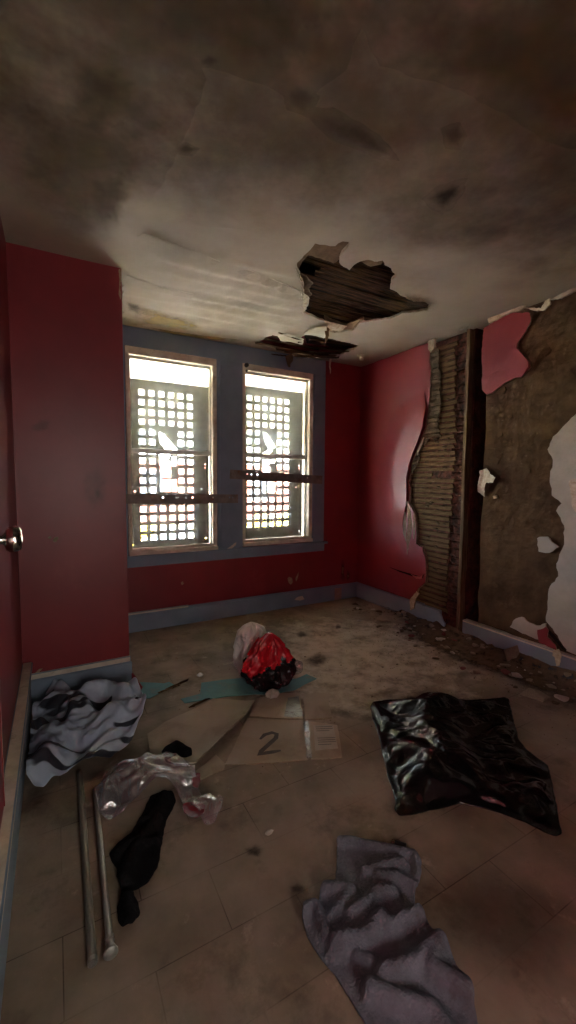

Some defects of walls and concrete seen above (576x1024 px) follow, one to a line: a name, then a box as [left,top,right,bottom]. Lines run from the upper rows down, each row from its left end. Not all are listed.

flaking render [403,341,458,613]
spalling [477,288,576,656]